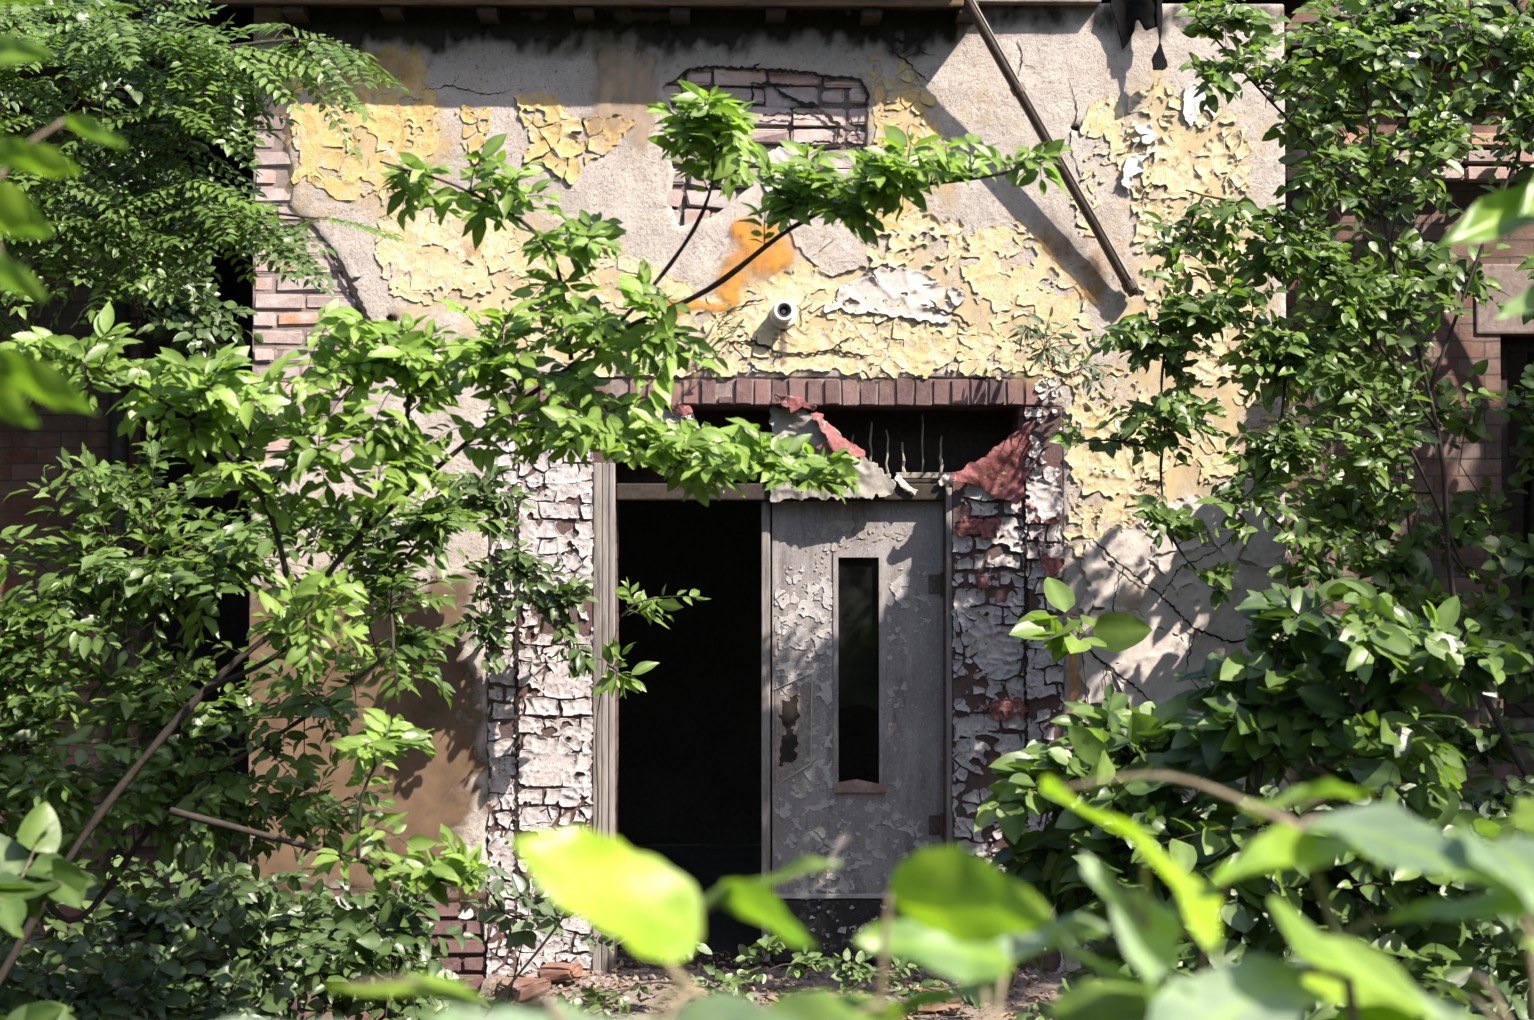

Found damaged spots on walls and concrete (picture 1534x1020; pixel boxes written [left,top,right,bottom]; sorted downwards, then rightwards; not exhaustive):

peeling [486,407,594,978]
rust [656,217,794,313]
peeling [252,43,1279,874]
peeling [775,520,929,960]
crack [1089,649,1155,704]
crack [1087,518,1255,690]